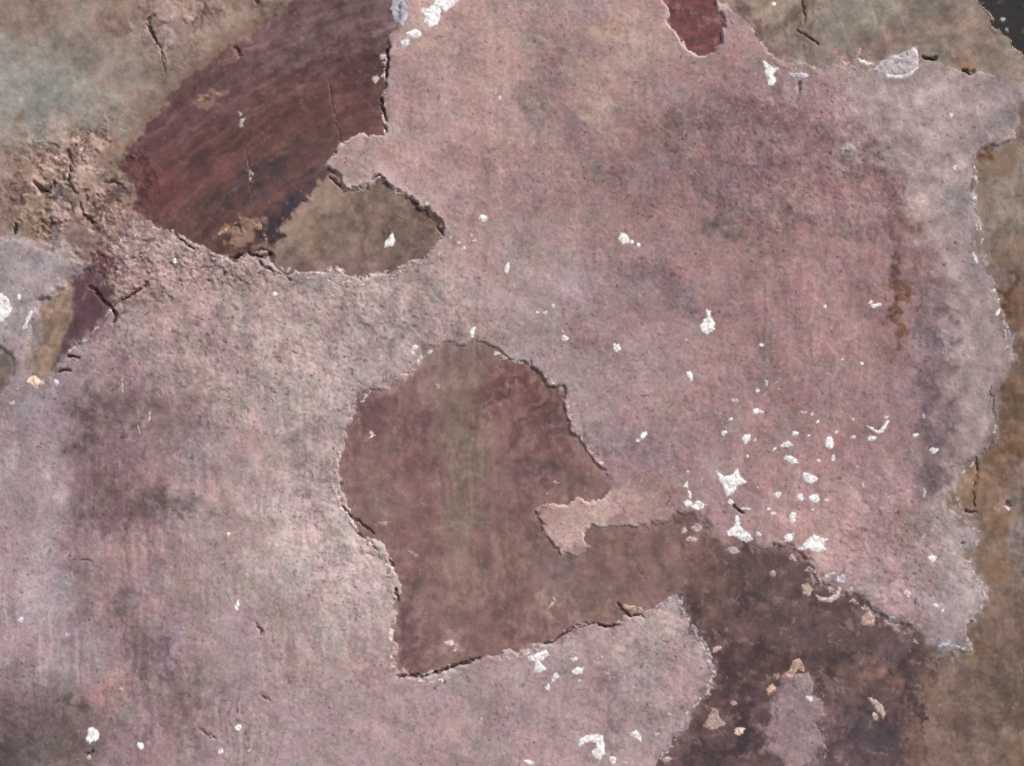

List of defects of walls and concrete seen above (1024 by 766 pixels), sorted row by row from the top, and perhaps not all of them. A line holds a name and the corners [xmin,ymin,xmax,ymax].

crack [147,15,165,67]
spalling [663,0,1024,87]
spalling [0,0,477,287]
spalling [23,270,112,388]
crack [92,284,148,322]
spalling [329,106,1024,766]